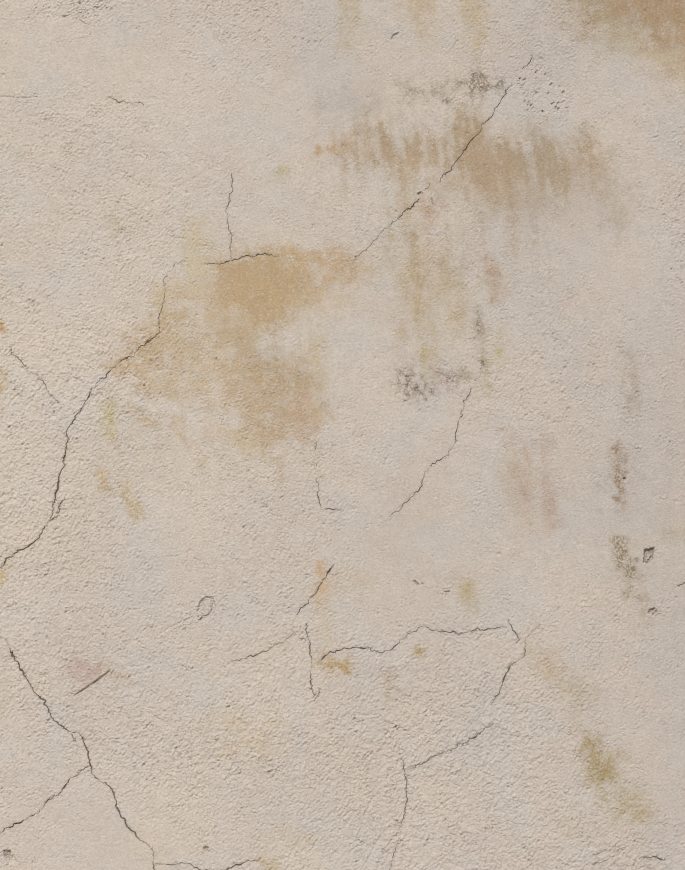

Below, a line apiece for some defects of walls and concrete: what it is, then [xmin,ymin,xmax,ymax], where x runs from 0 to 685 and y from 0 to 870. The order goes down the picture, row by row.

crack [207,166,279,266]
damp [94,0,647,488]
crack [356,55,534,259]
damp [545,0,685,93]
crack [0,260,182,569]
crack [0,632,260,870]
crack [231,565,541,870]